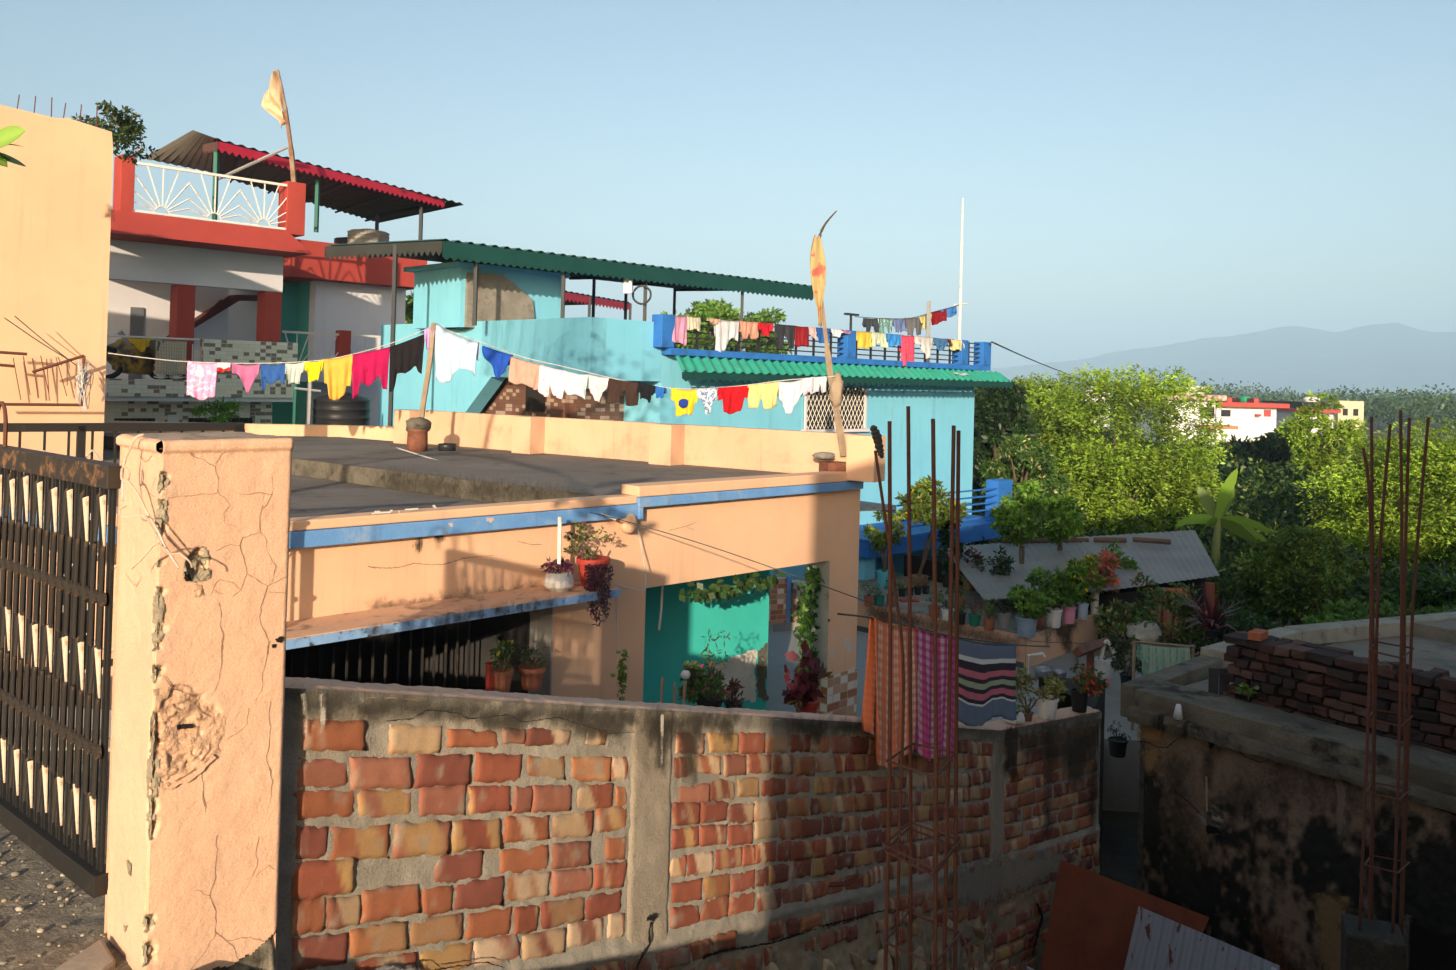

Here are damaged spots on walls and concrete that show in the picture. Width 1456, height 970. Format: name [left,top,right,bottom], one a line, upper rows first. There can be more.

crack [368,541,541,569]
crack [139,448,285,968]
flaking render [146,711,160,841]
flaking render [123,914,154,967]
crack [386,961,503,970]